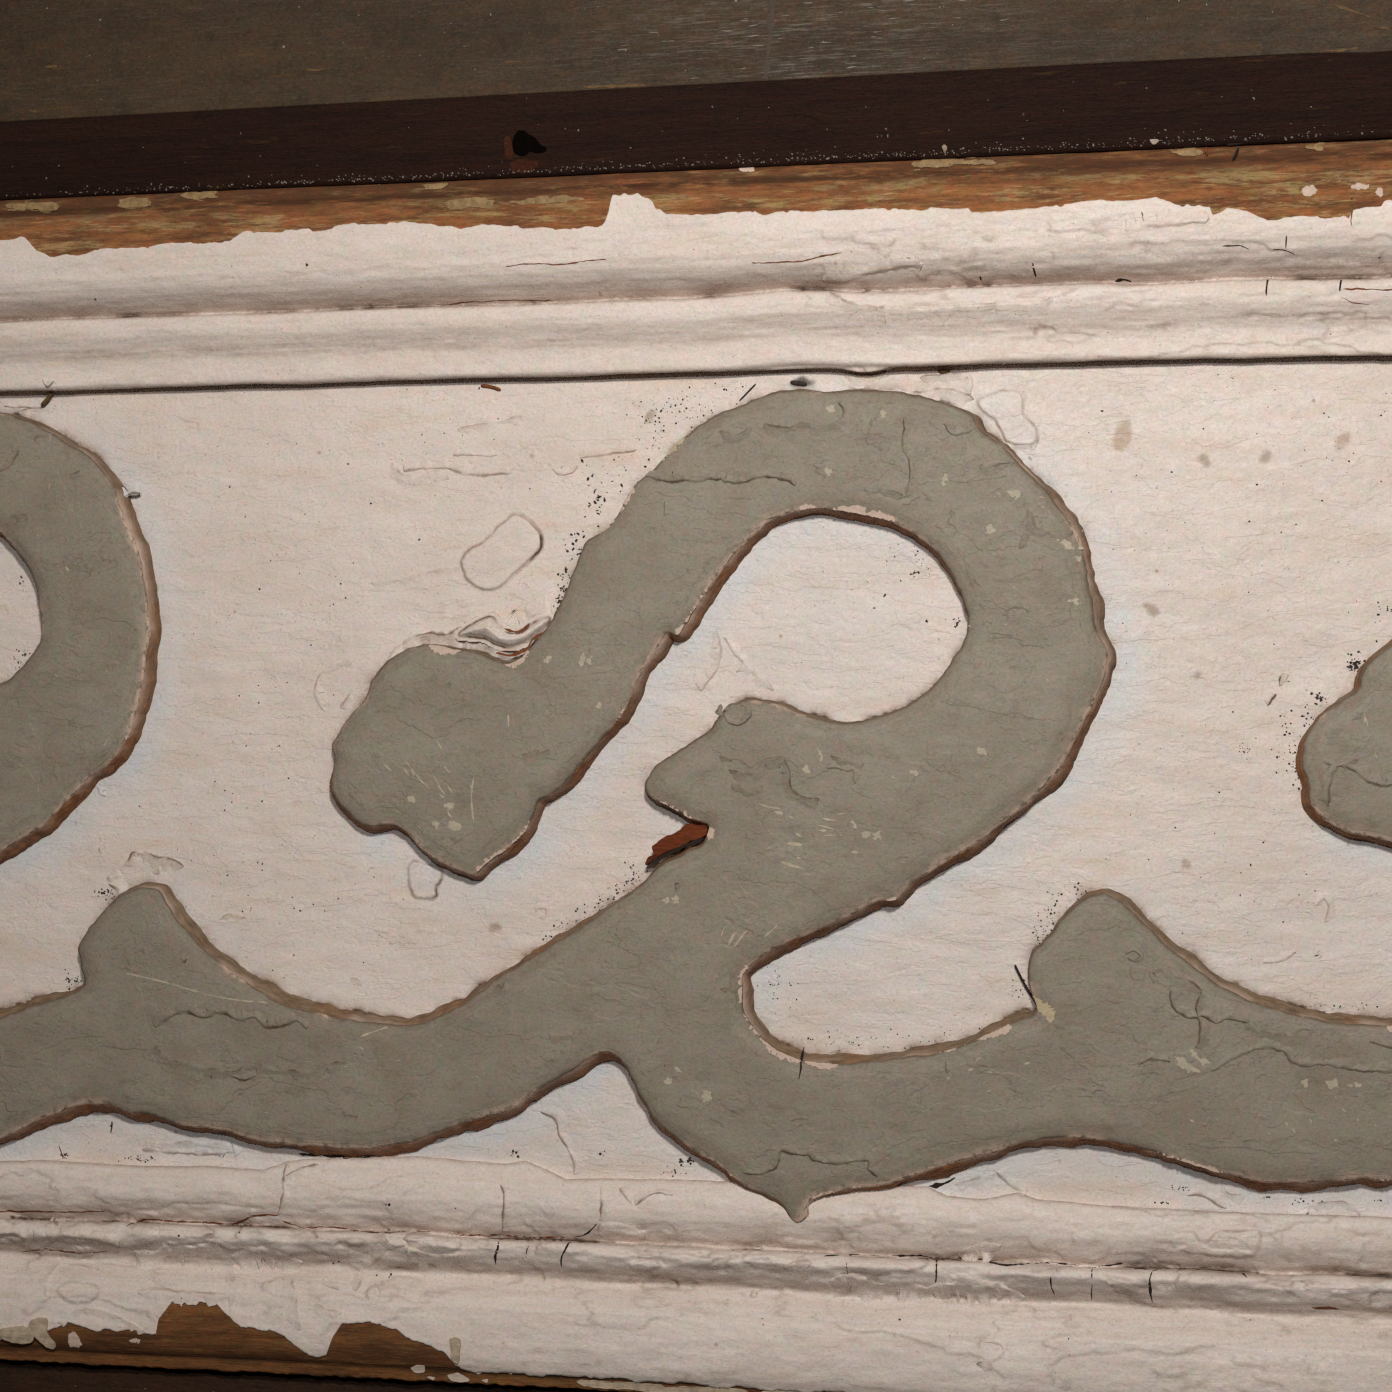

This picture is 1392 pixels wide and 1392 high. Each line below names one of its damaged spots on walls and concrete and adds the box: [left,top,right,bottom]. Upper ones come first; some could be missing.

peeling [651,139,1392,220]
peeling [0,183,609,257]
crack [299,1152,375,1160]
crack [743,1142,880,1177]
crack [929,1177,955,1188]
crack [0,1210,597,1267]
crack [825,1254,1247,1303]
peeling [0,1302,308,1361]
peeling [328,1322,488,1383]
crack [1311,1304,1340,1312]
peeling [576,1379,668,1392]